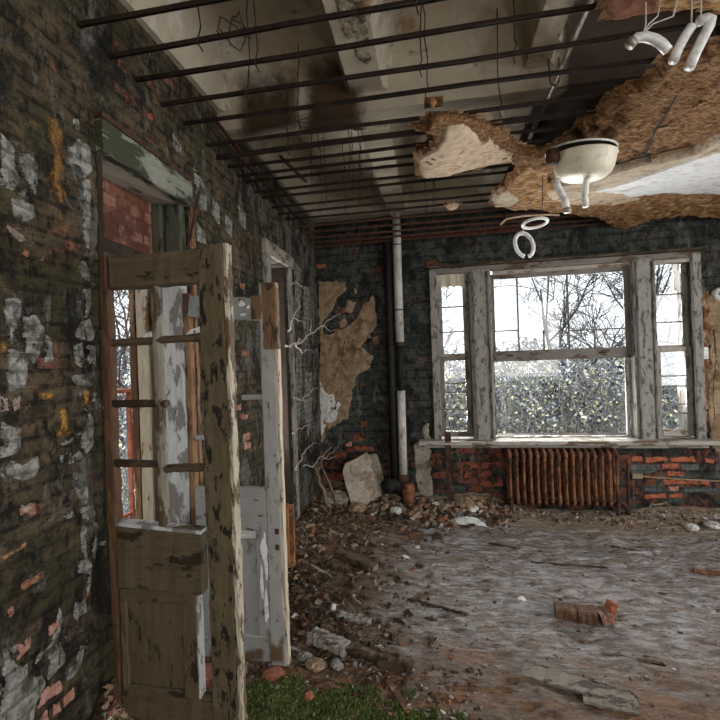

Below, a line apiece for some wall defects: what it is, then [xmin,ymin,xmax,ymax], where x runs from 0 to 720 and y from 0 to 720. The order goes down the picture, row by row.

water stain [242,77,297,135]
water stain [305,60,363,135]
peeling [0,128,38,257]
peeling [64,113,95,253]
peeling [295,262,379,443]
peeling [0,261,106,720]
spalling [322,436,374,480]